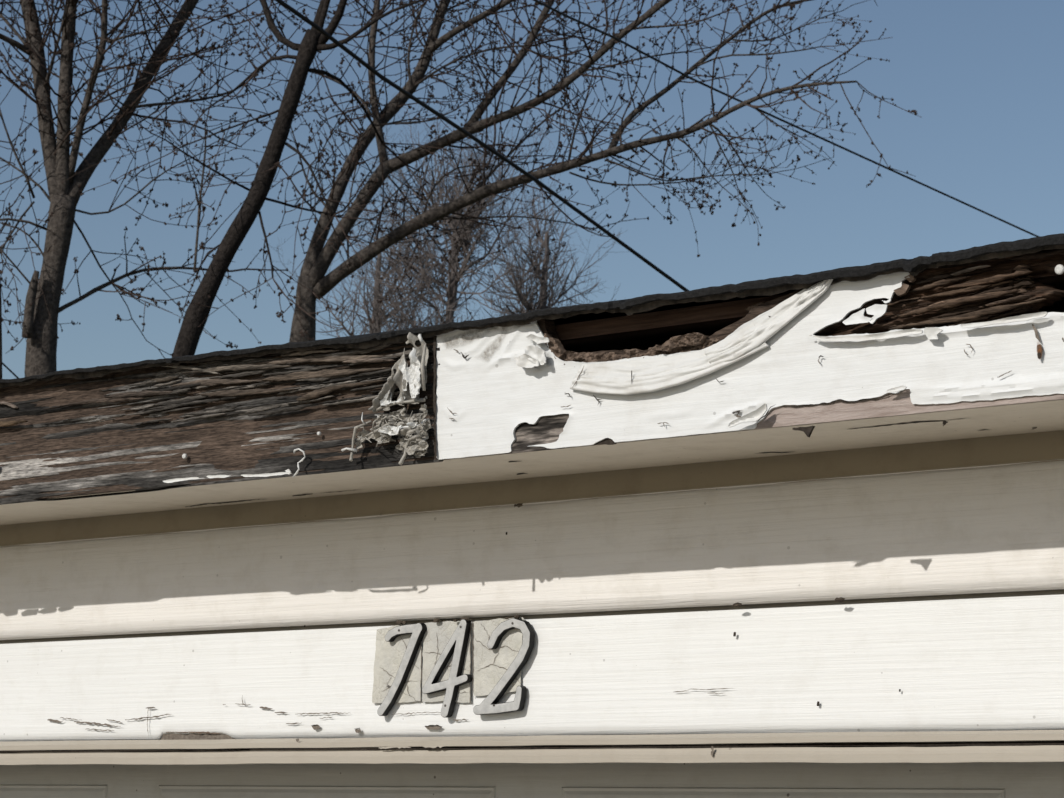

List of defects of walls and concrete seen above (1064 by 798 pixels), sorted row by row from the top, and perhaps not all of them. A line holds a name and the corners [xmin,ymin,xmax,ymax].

peeling [843,298,892,325]
peeling [570,279,833,404]
peeling [923,327,943,340]
peeling [341,332,437,465]
peeling [728,385,1064,437]
peeling [505,414,569,454]
peeling [163,448,306,483]